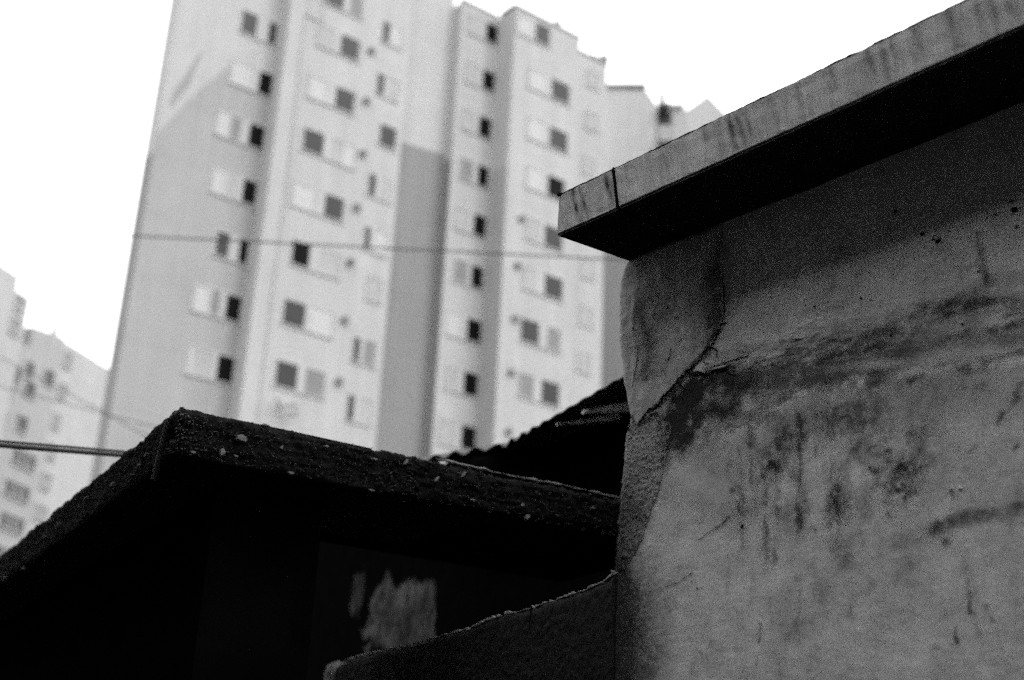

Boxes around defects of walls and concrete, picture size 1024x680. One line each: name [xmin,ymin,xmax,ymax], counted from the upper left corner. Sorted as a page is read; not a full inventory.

crack [627,275,776,431]
damp [661,297,1024,518]
damp [796,484,846,531]
damp [929,509,995,543]